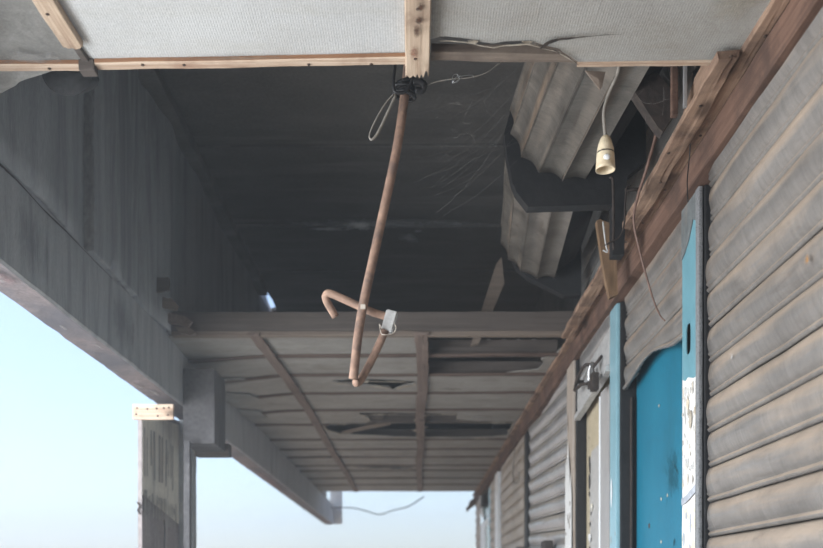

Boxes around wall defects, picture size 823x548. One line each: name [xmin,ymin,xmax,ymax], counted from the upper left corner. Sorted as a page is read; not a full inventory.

spalling [449,40,575,63]
peeling [585,70,605,90]
peeling [682,380,696,489]